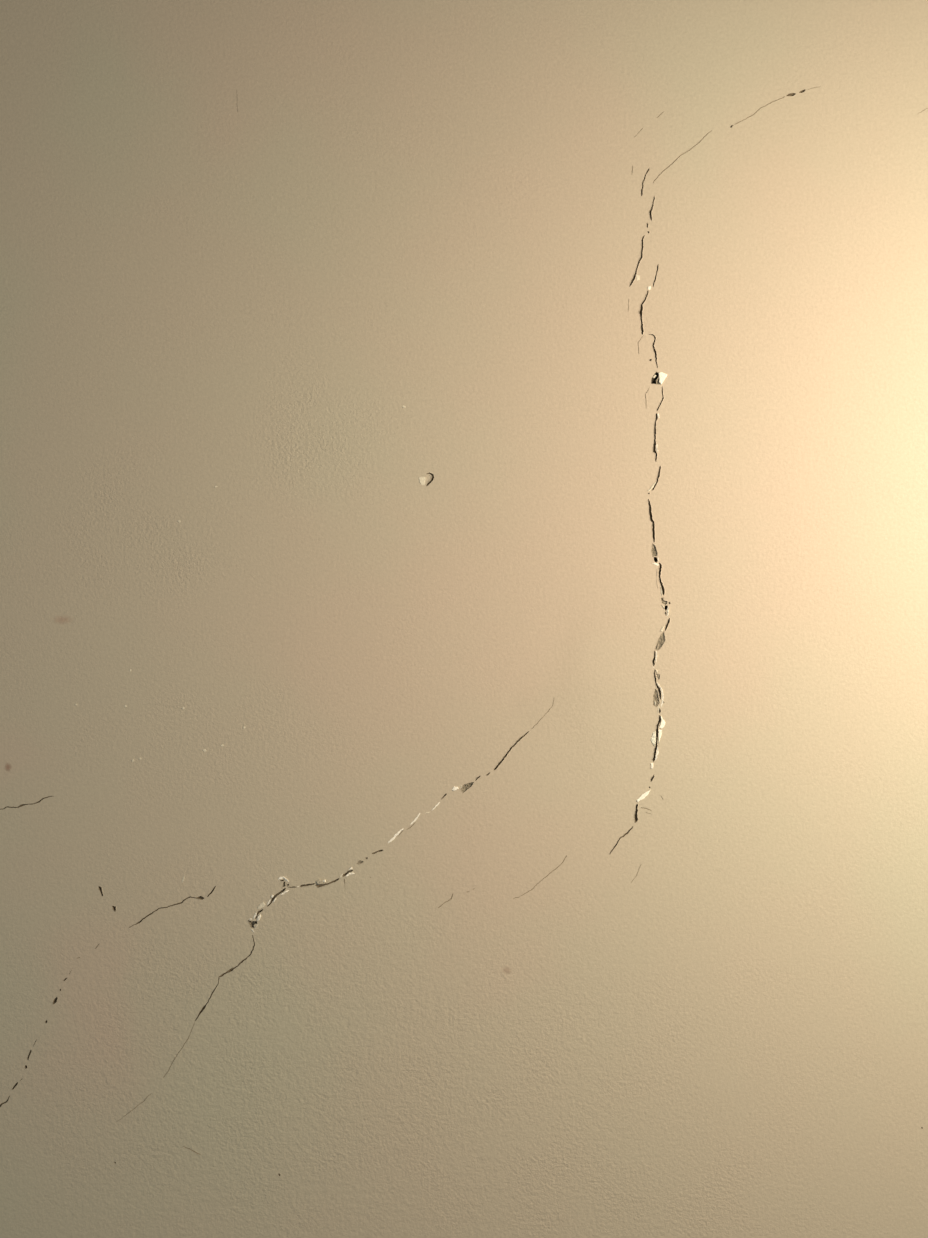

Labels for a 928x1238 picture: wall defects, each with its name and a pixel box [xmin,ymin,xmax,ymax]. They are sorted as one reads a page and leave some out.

crack [609,86,821,855]
crack [0,796,54,810]
crack [116,699,554,1122]
crack [513,855,567,899]
crack [0,943,100,1108]